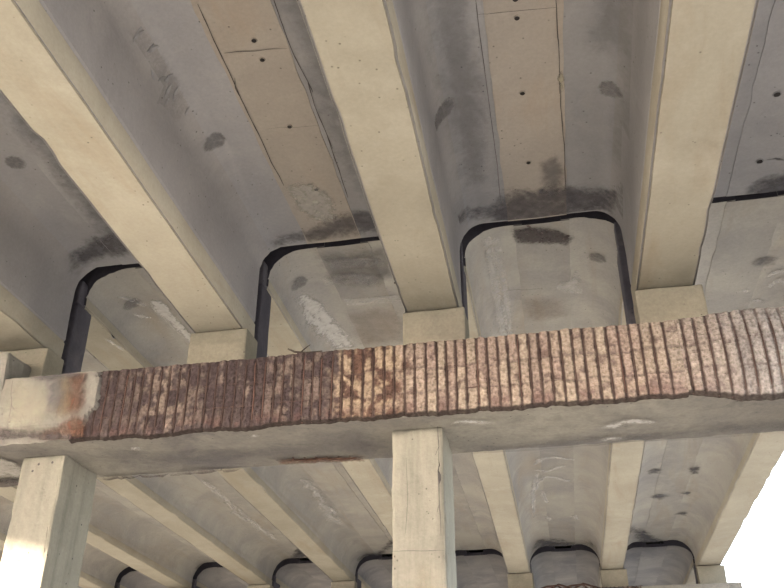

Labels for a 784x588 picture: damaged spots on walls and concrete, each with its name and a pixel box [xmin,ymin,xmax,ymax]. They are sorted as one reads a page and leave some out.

damp [492,187,616,221]
damp [72,235,127,262]
damp [121,297,191,343]
damp [297,295,354,348]
spalling [0,320,689,444]
corrosion [41,373,85,440]
peeling [0,459,21,487]